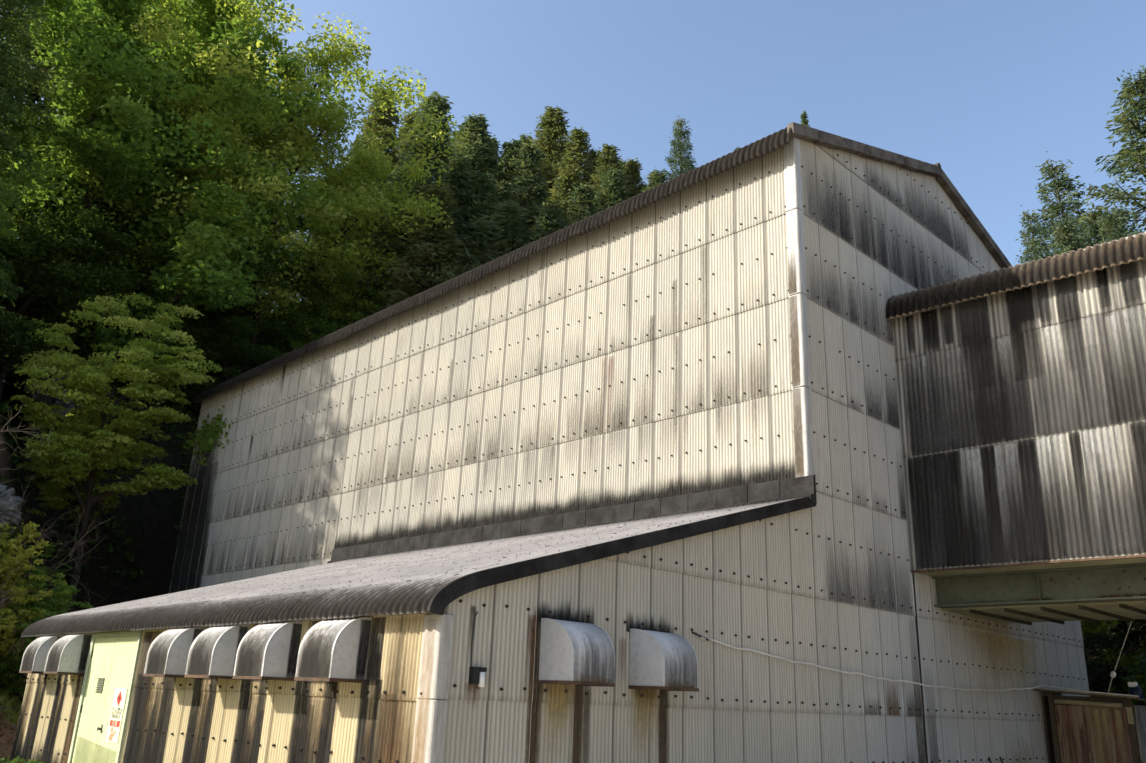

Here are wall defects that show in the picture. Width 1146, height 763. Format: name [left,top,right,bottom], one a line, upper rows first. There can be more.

leakage [788,270,796,294]
leakage [790,308,800,384]
leakage [810,194,938,289]
leakage [869,177,969,259]
leakage [334,409,804,549]
leakage [868,261,1146,568]
leakage [9,635,92,763]
leakage [123,627,218,763]
leakage [230,624,267,763]
leakage [287,621,337,763]